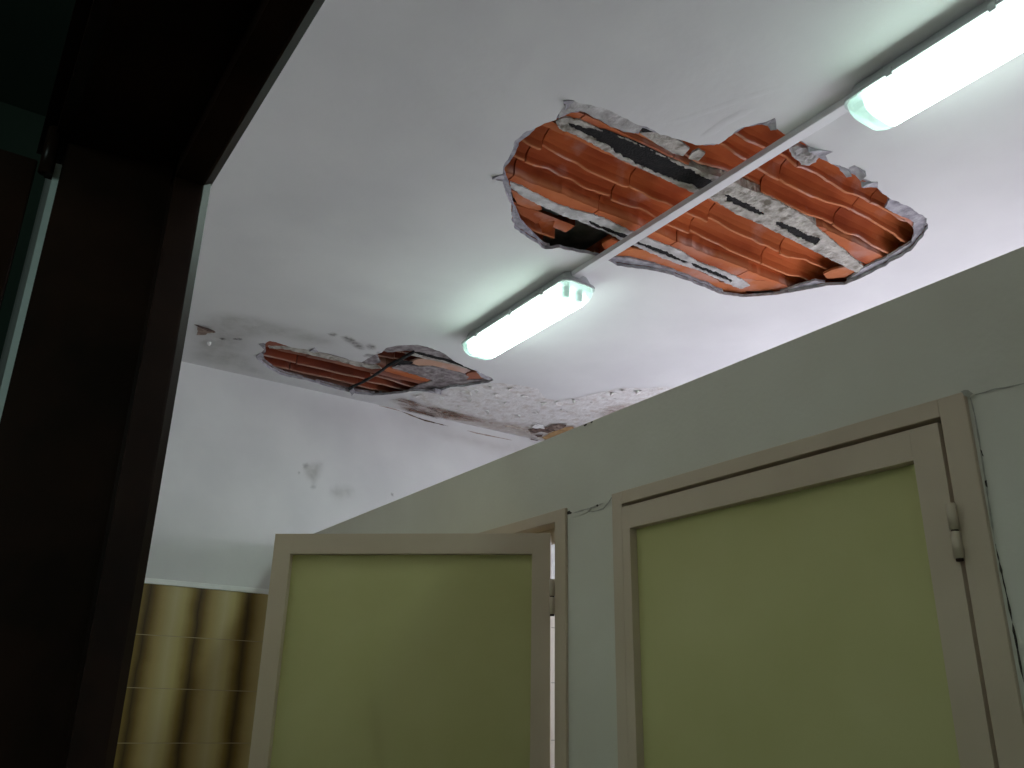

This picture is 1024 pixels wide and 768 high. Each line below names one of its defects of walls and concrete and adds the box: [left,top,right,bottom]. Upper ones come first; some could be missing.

spalling [492,100,927,294]
peeling [256,341,672,441]